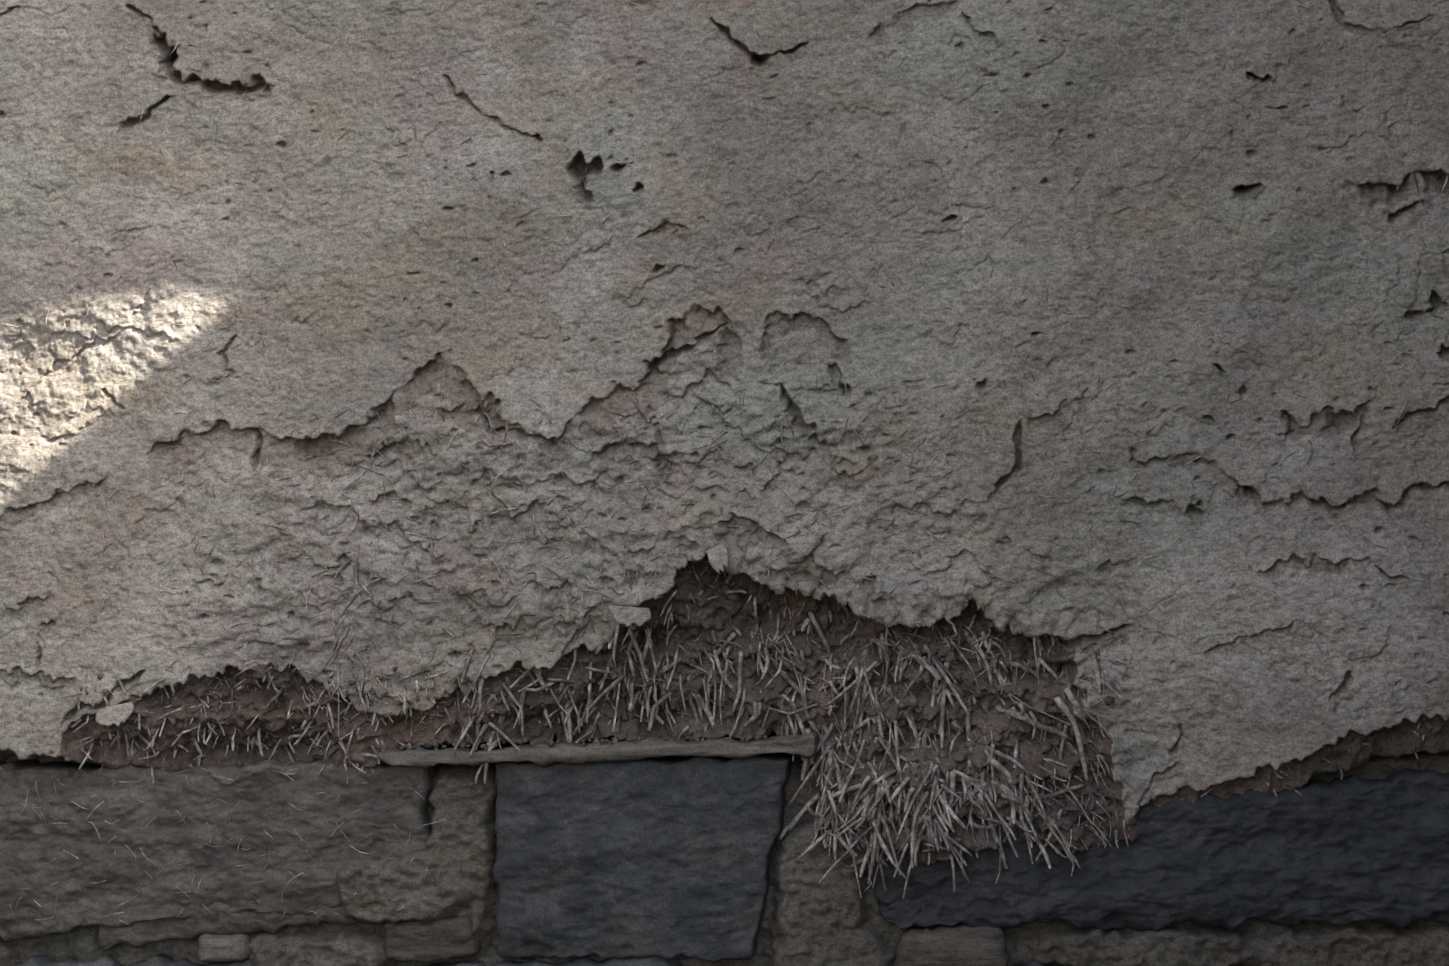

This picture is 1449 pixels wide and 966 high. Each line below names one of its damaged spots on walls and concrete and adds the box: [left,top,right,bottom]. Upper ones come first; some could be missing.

crack [0,5,23,17]
crack [117,3,275,133]
crack [709,17,809,68]
crack [868,0,999,45]
spalling [1184,493,1207,521]
crack [1119,451,1449,518]
crack [1248,551,1411,584]
spalling [0,511,1449,898]